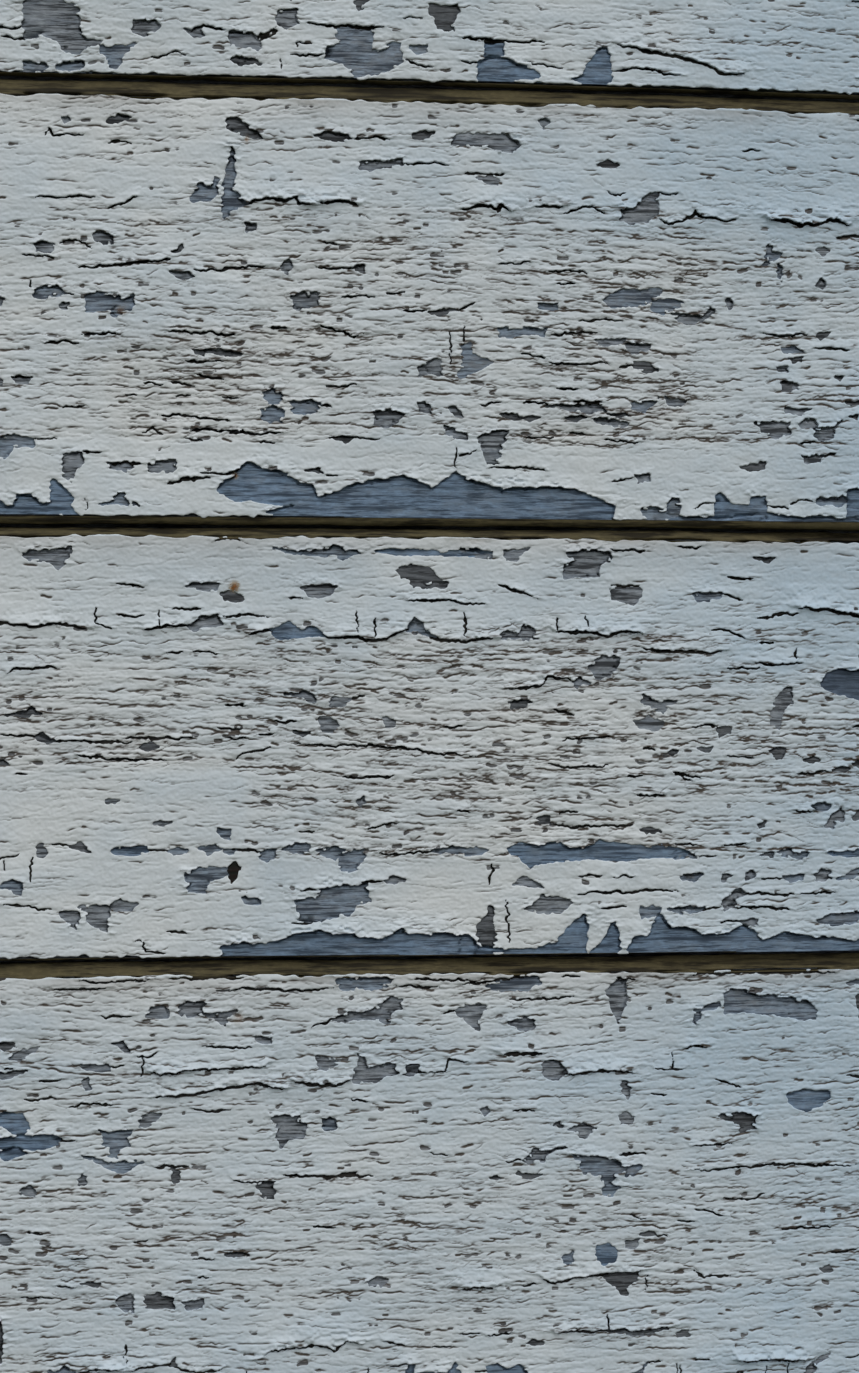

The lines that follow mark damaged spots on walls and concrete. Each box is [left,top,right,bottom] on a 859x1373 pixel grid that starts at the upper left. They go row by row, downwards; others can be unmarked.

peeling [0,0,161,74]
peeling [183,0,428,79]
peeling [190,117,265,233]
peeling [754,346,859,465]
peeling [217,395,687,520]
peeling [640,461,859,522]
peeling [272,541,530,589]
crack [0,578,269,674]
peeling [128,576,538,644]
peeling [110,815,859,956]
peeling [0,1103,189,1186]
peeling [489,1121,647,1197]